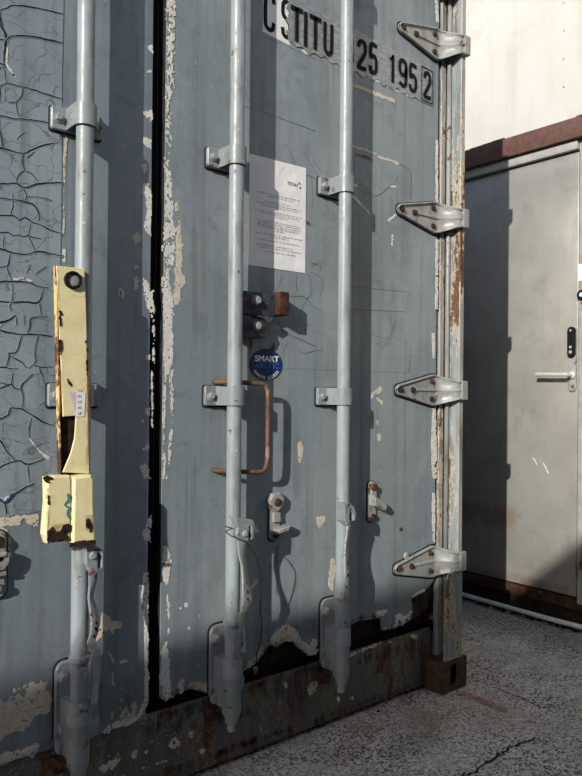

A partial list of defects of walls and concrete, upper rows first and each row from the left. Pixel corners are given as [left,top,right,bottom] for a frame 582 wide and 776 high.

crack [0,0,63,438]
peeling [132,0,186,479]
crack [0,439,44,514]
peeling [142,515,152,543]
peeling [161,545,172,585]
peeling [96,613,122,641]
peeling [103,572,207,734]
peeling [245,625,318,670]
peeling [374,609,413,629]
peeling [0,680,52,741]
peeling [0,743,41,766]
crack [462,738,539,776]